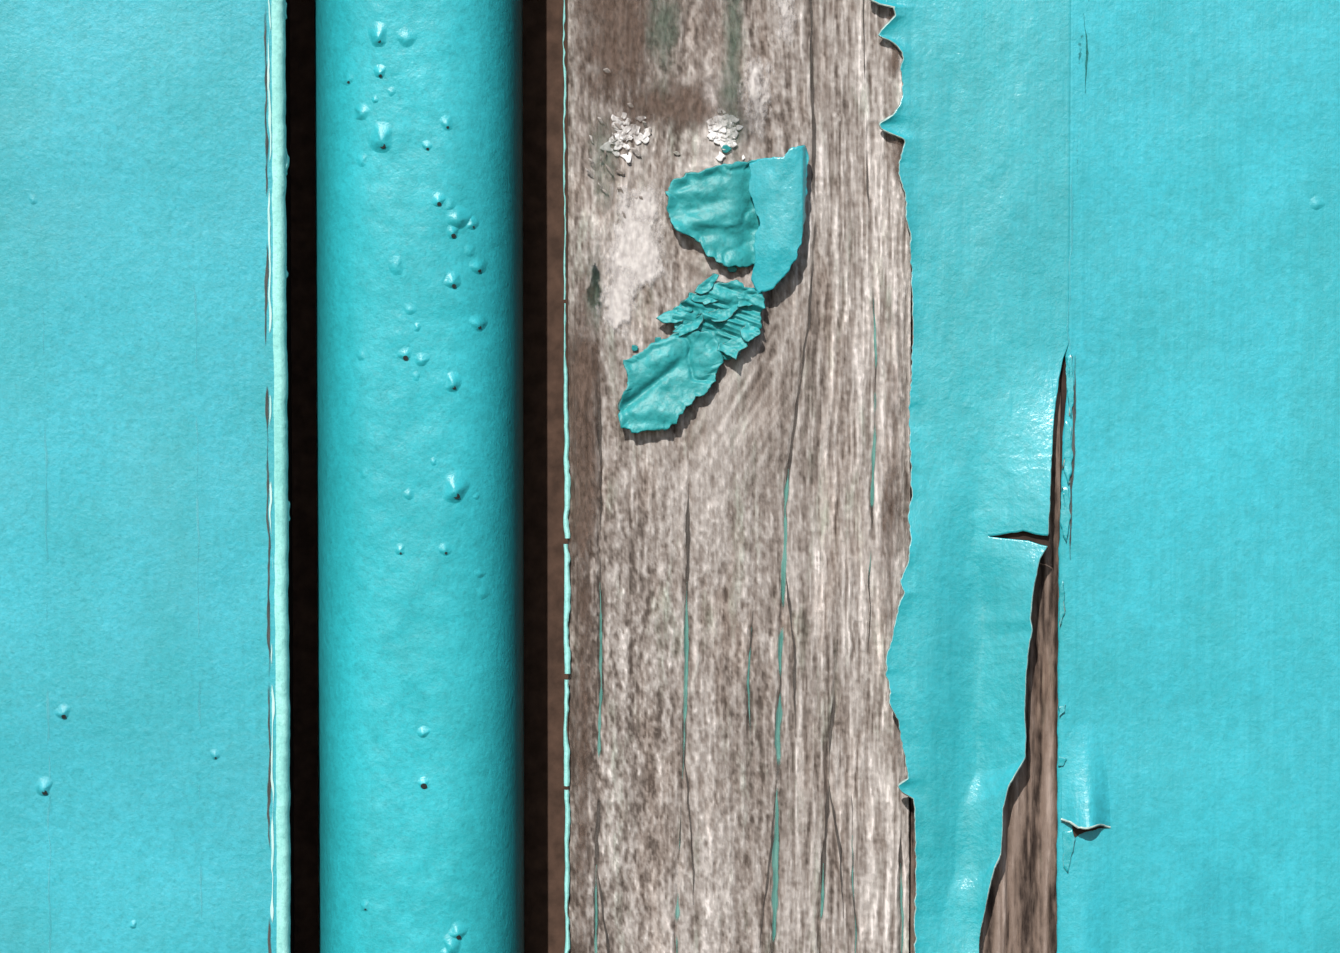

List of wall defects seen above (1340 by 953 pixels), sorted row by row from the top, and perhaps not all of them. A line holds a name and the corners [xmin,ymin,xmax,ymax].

peeling [600,112,651,163]
peeling [618,110,809,433]
peeling [870,0,1076,953]